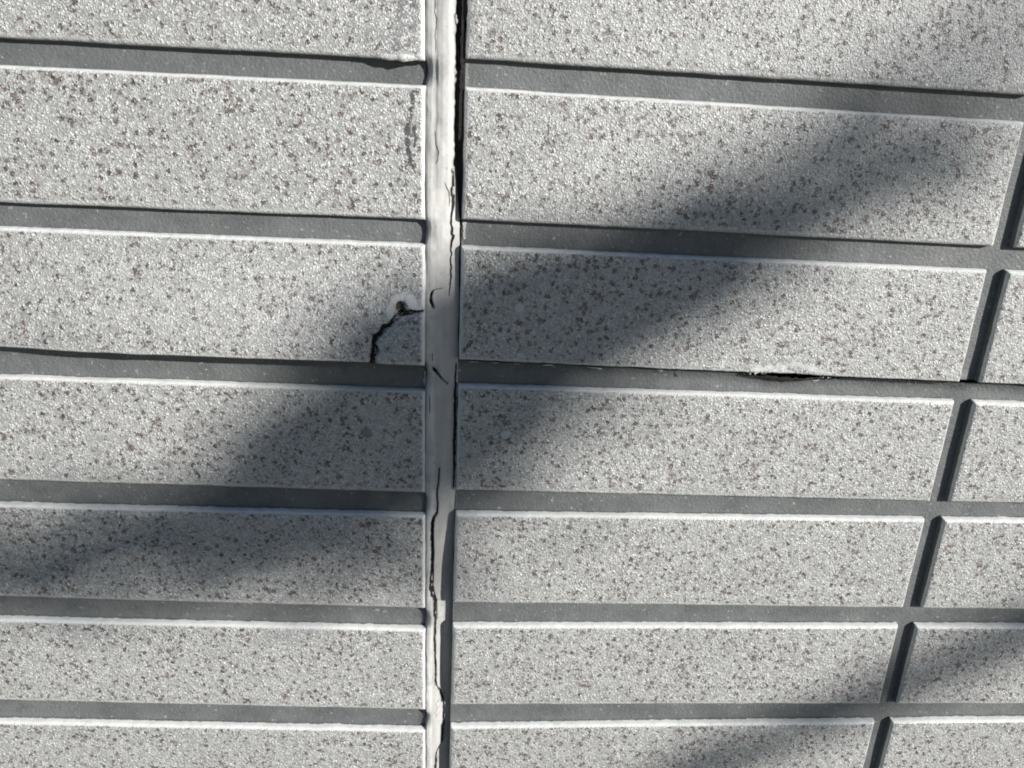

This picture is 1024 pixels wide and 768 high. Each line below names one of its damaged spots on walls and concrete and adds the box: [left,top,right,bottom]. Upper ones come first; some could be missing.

crack [435,133,450,207]
crack [369,288,442,363]
crack [429,352,447,413]
crack [429,467,445,768]